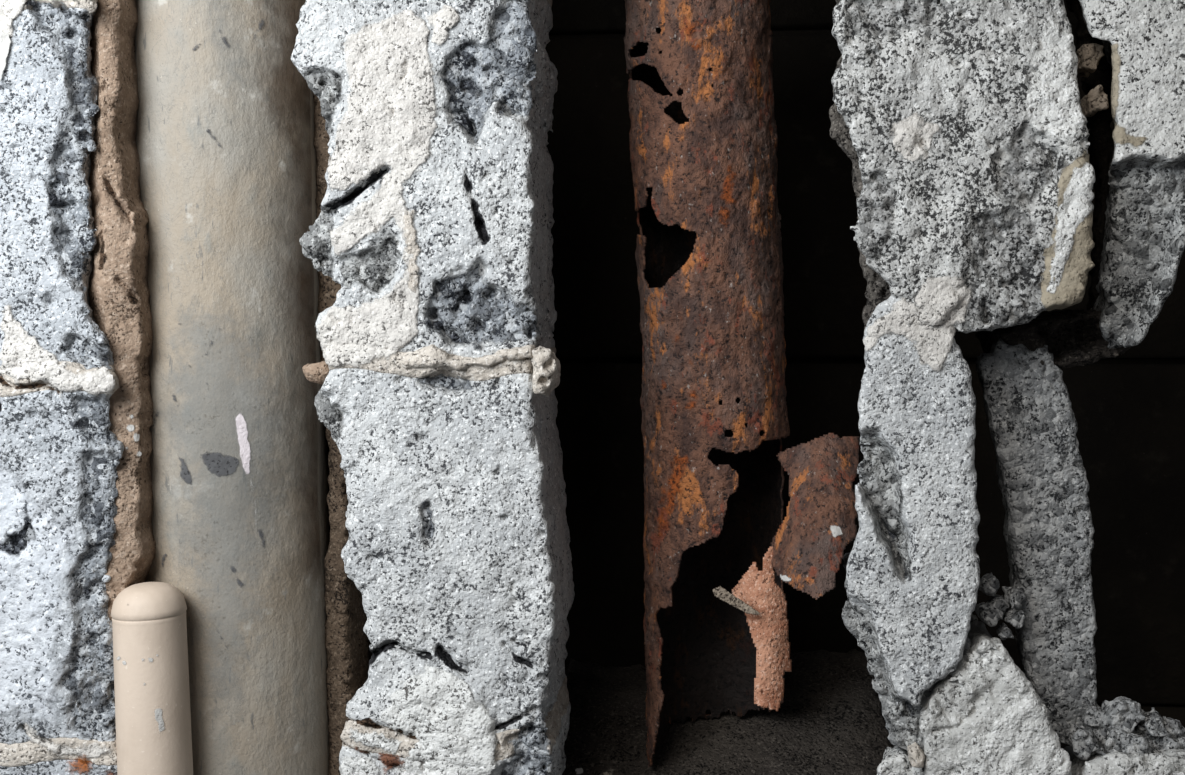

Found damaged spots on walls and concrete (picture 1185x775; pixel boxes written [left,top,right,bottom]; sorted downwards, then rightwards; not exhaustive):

crack [1065,0,1114,310]
crack [323,169,387,214]
crack [463,174,489,245]
spalling [314,390,343,442]